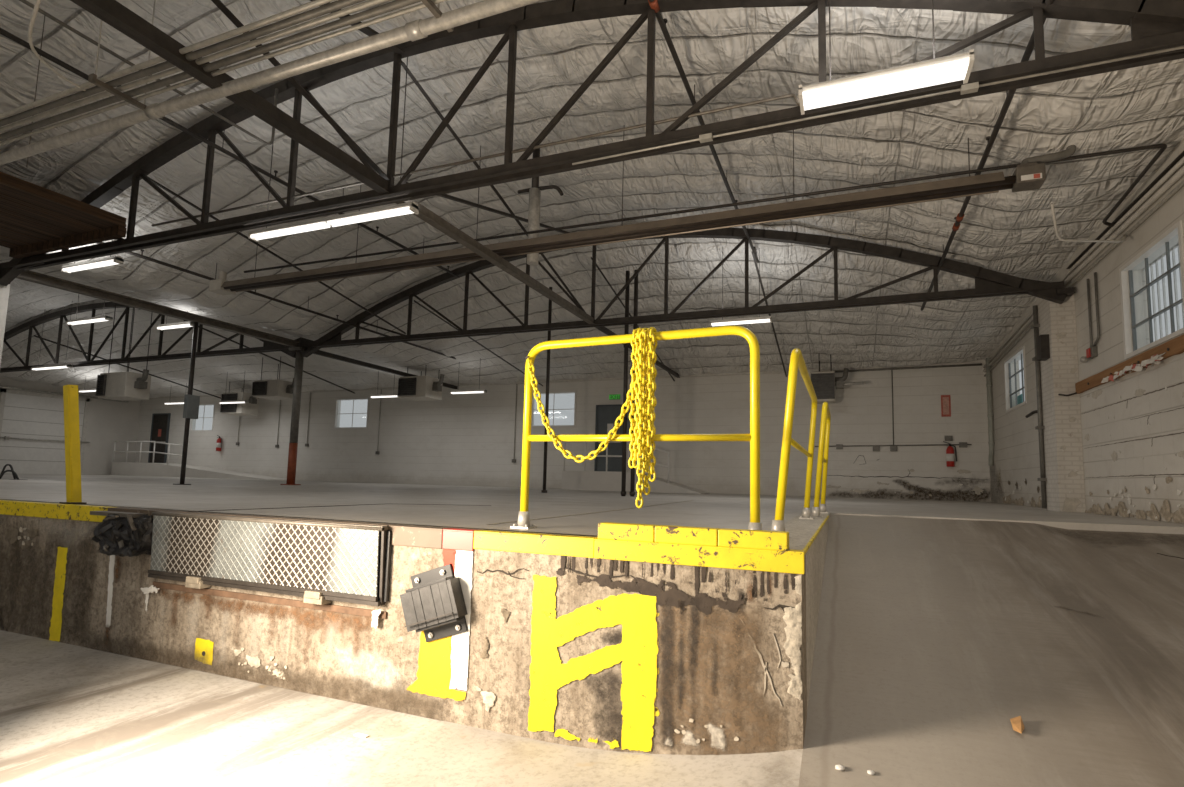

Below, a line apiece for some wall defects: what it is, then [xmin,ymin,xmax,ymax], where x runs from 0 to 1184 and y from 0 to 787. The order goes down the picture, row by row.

spalling [1085,477,1184,523]
damp [0,527,440,720]
damp [556,556,795,755]